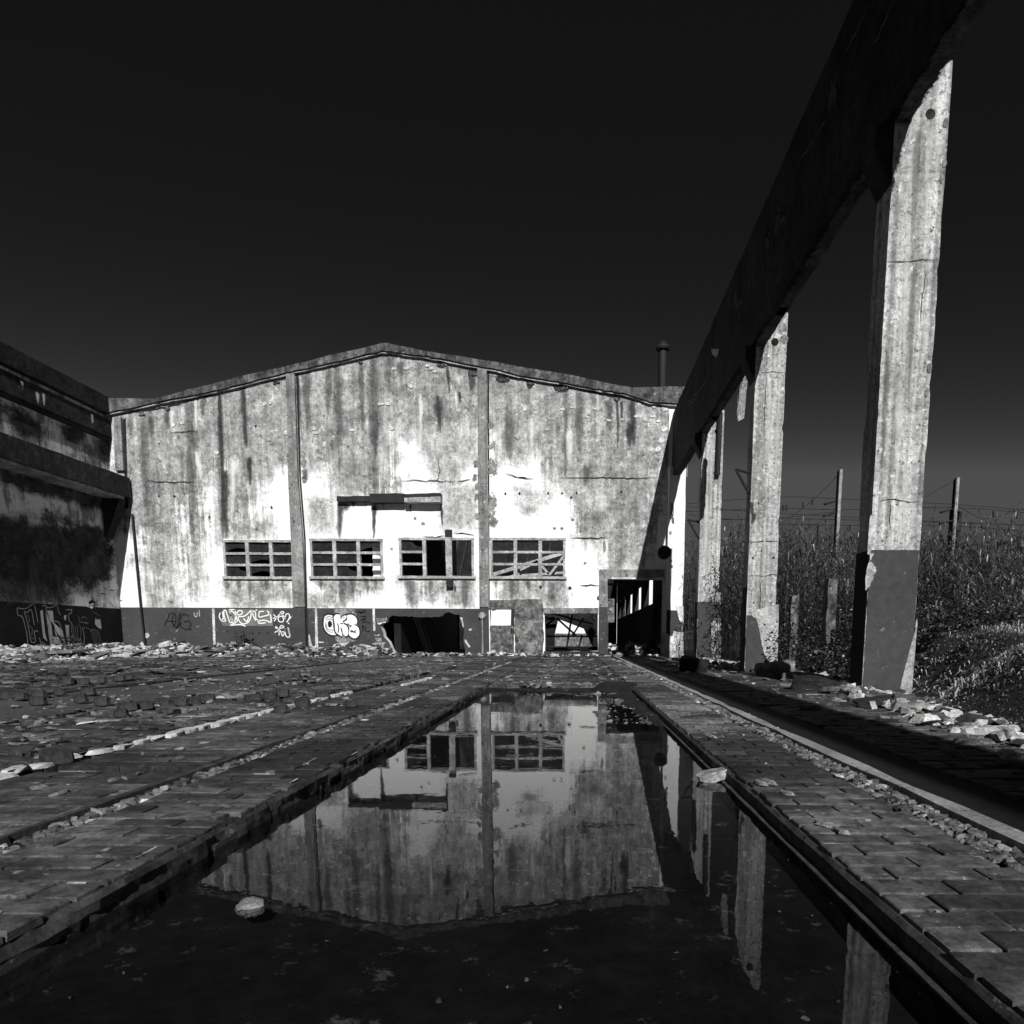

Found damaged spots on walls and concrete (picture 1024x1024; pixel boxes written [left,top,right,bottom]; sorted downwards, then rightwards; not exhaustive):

water stain [0,393,45,442]
water stain [61,415,93,450]
water stain [99,440,110,463]
water stain [218,388,251,531]
crack [408,458,469,482]
water stain [419,367,475,430]
water stain [616,401,640,446]
water stain [0,469,117,610]
peeling [397,579,475,647]